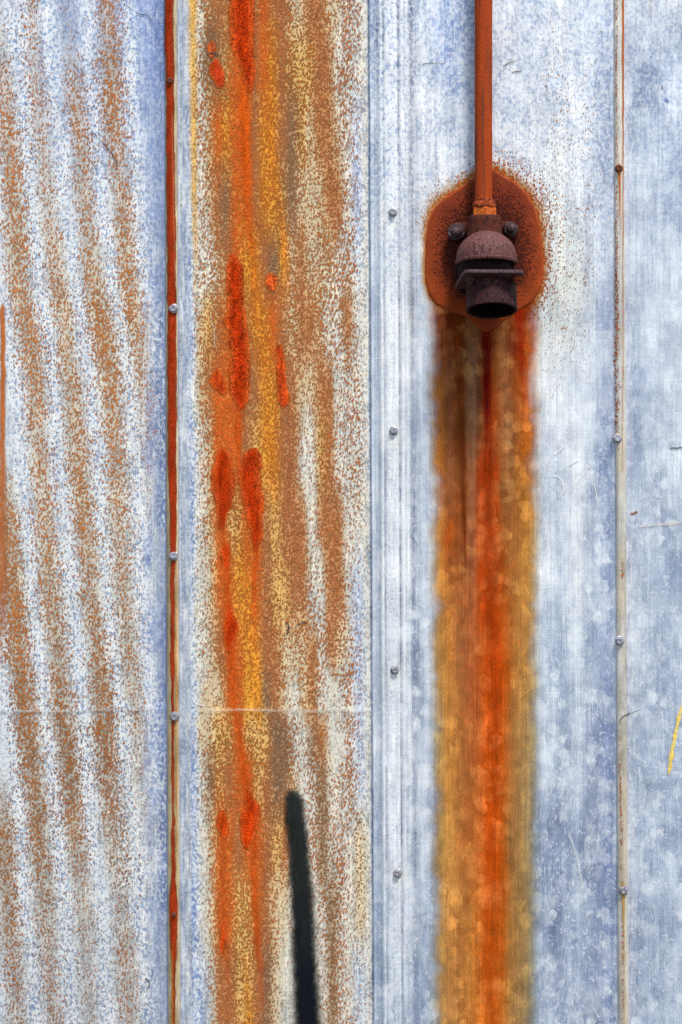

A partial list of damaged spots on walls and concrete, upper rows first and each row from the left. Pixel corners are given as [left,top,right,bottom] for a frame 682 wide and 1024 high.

corrosion [0,0,178,1024]
corrosion [189,0,373,1024]
corrosion [393,0,624,1024]